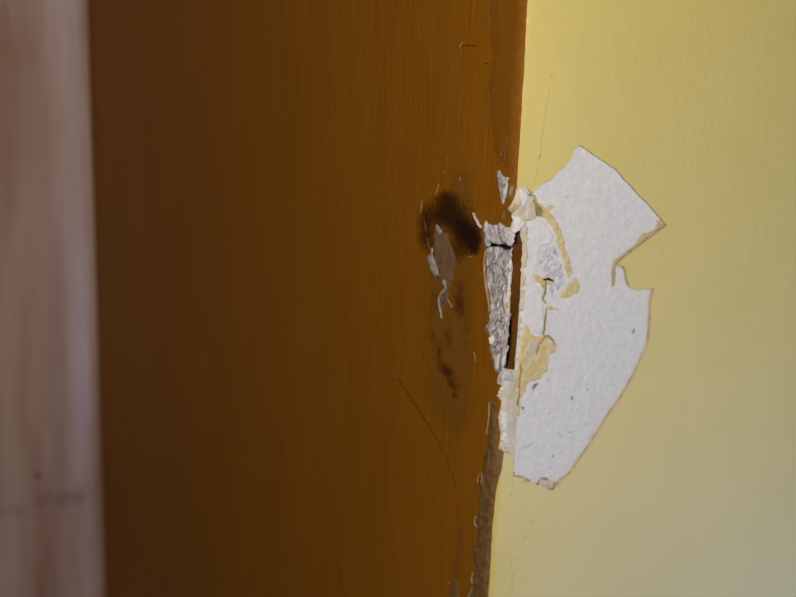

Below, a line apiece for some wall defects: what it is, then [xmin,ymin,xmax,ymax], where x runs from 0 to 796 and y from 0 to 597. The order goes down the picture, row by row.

peeling [427,224,456,318]
damp [418,191,481,257]
peeling [448,145,665,597]